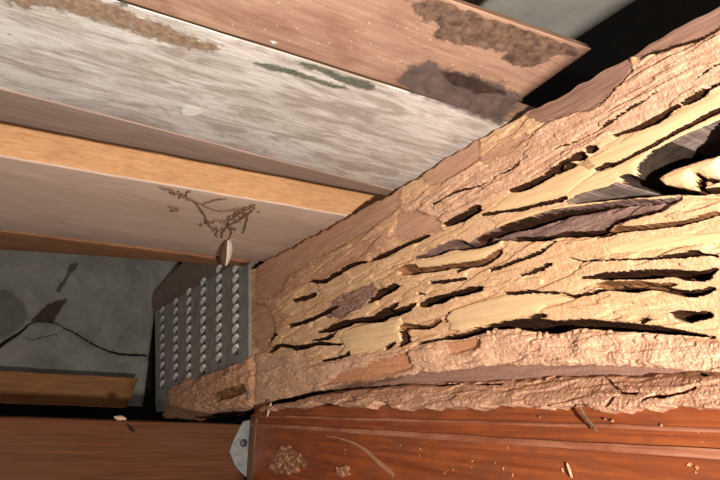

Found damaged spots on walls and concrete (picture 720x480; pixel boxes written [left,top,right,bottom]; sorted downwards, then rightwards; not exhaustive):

leakage [254,62,375,90]
leakage [399,61,522,126]
crack [268,26,720,362]
crack [0,321,147,356]